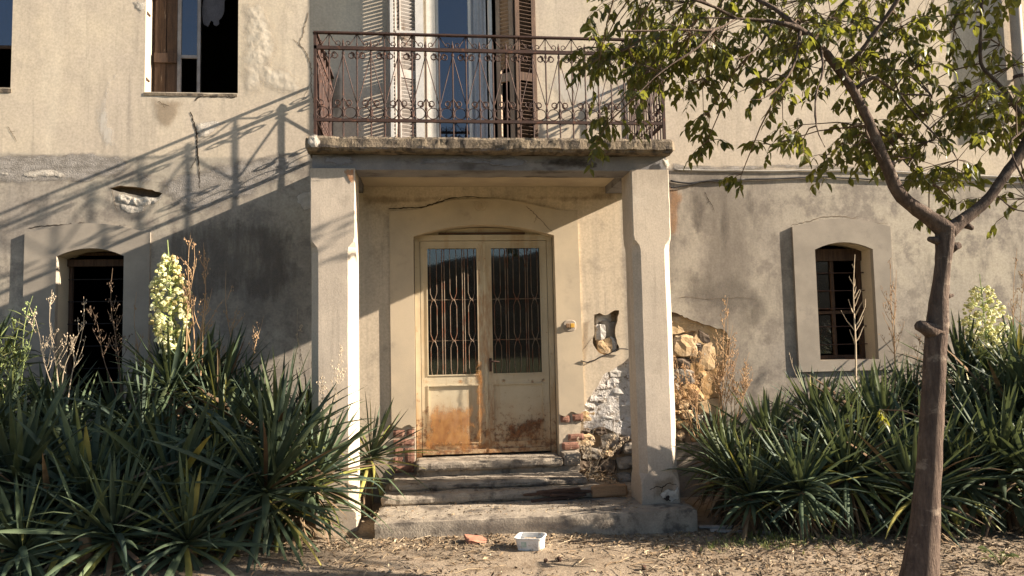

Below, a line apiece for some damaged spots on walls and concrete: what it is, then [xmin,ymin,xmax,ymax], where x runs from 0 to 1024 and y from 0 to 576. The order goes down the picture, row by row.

flaking render [115,152,304,213]
crack [389,196,481,209]
flaking render [593,311,617,355]
rust [426,365,482,451]
flaking render [393,429,414,473]
rust [500,418,544,444]